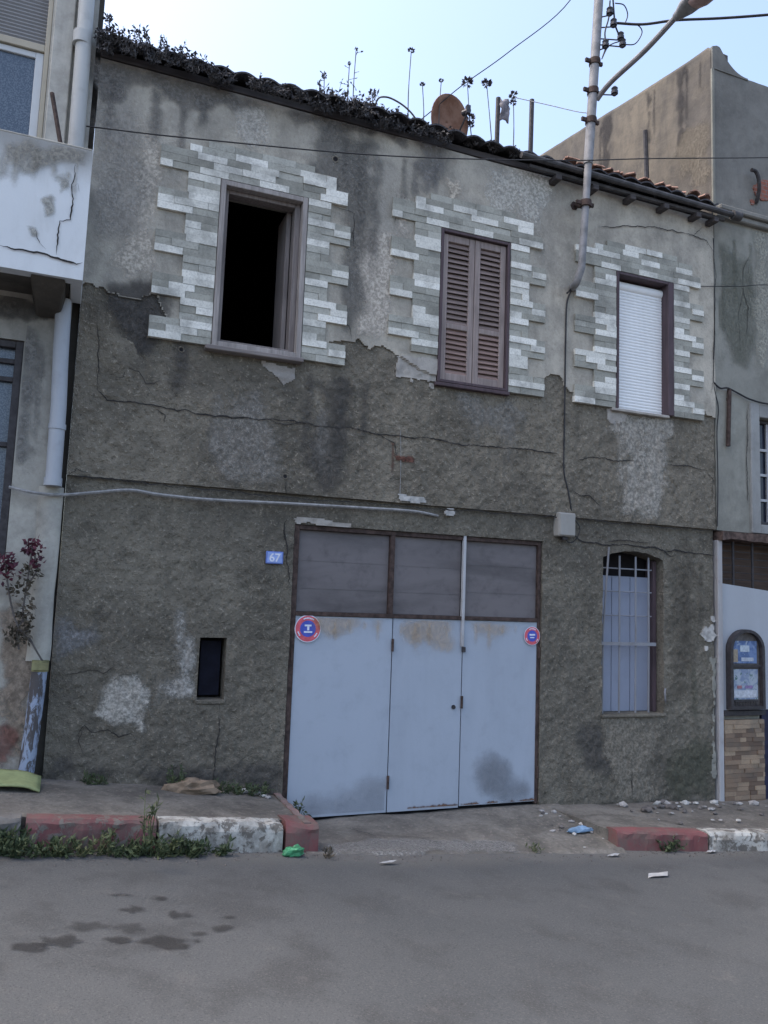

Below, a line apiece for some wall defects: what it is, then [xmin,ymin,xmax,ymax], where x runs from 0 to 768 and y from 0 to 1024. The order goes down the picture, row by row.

water stain [600,116,612,169]
water stain [675,68,709,182]
crack [0,167,80,265]
water stain [485,171,551,223]
crack [602,225,749,392]
peeling [261,361,295,385]
crack [97,328,630,462]
peeling [395,355,438,389]
peeling [0,604,32,762]
crack [76,725,135,754]
peeling [95,676,150,732]
flaking render [699,616,717,778]